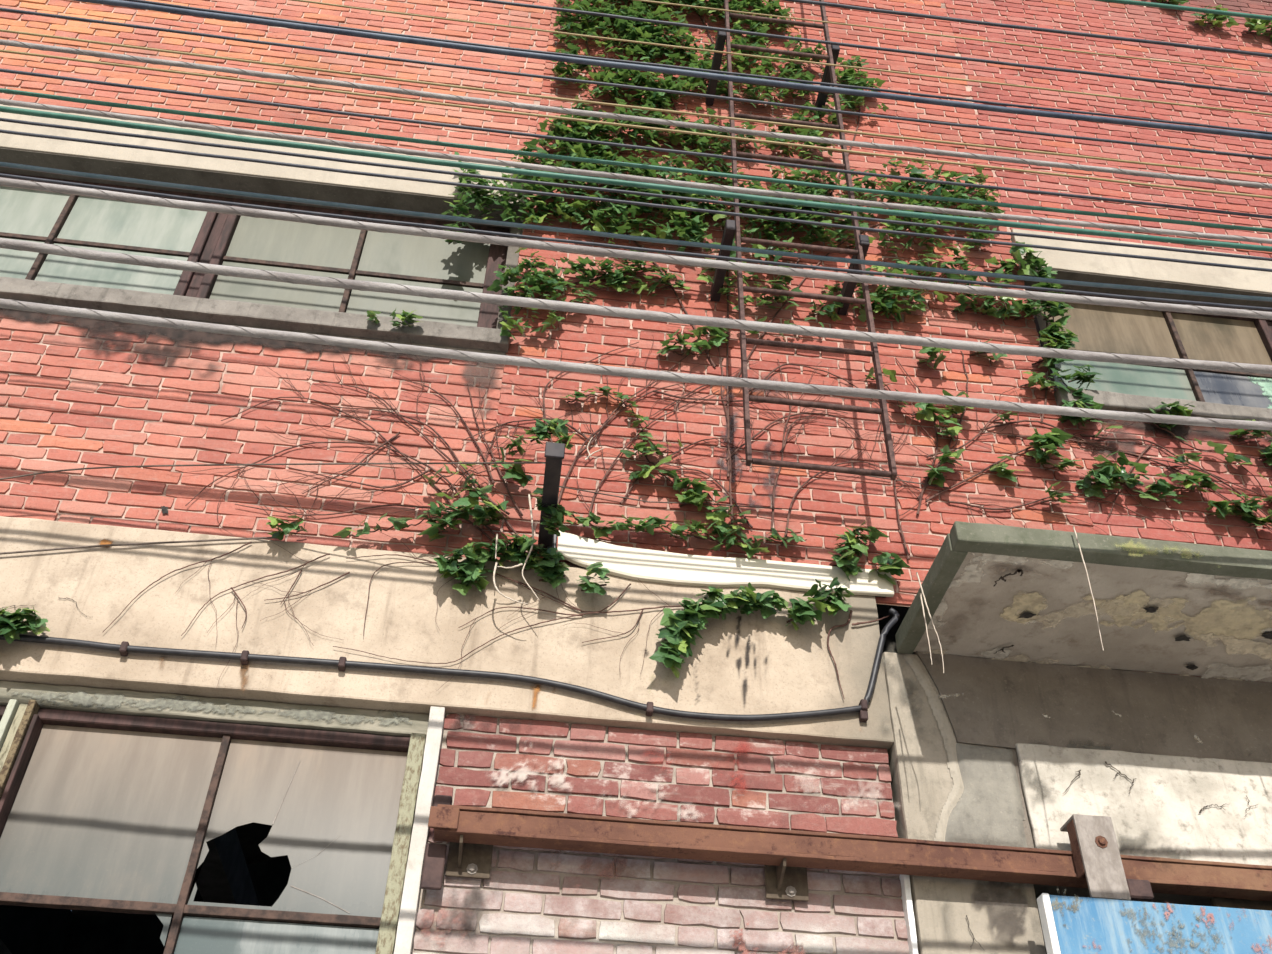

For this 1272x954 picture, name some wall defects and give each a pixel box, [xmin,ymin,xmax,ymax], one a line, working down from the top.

damp [0,308,439,368]
peeling [951,553,1029,585]
peeling [1043,560,1073,569]
peeling [927,598,948,629]
peeling [1000,573,1272,681]
damp [727,616,767,701]
peeling [730,923,758,954]
damp [974,881,1027,944]